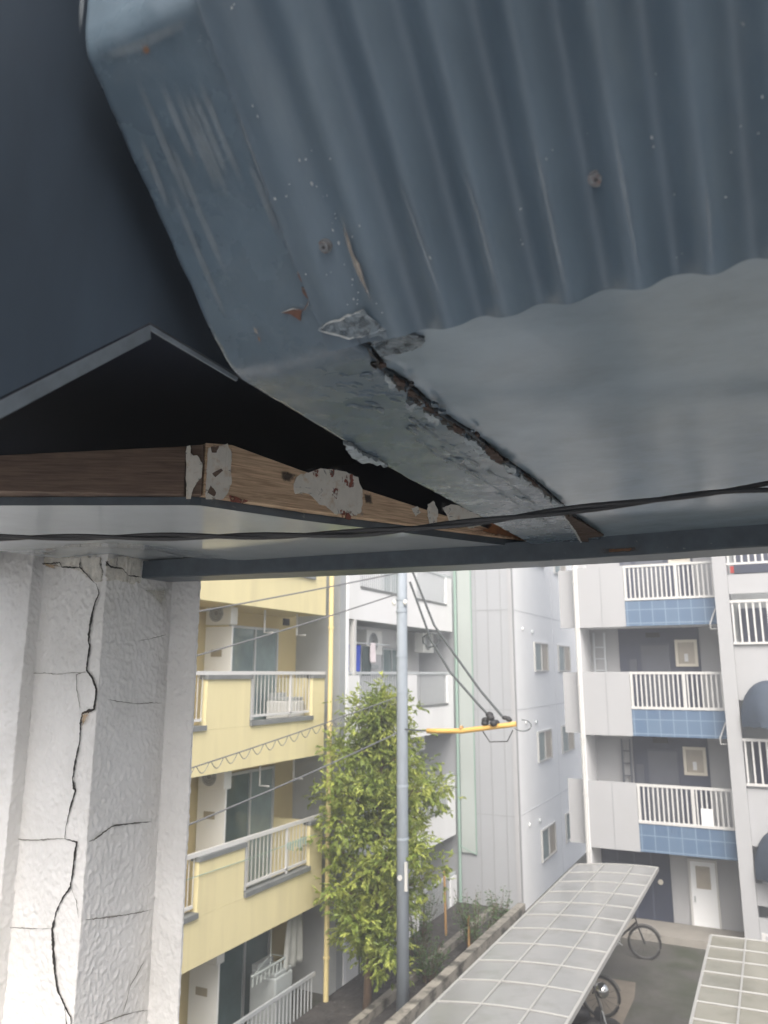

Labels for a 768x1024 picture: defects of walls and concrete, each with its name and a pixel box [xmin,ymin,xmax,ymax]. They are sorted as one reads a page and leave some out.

peeling [318,213,425,357]
peeling [186,443,248,504]
peeling [294,468,363,520]
peeling [343,440,388,468]
peeling [411,501,481,529]
crack [10,584,157,1024]